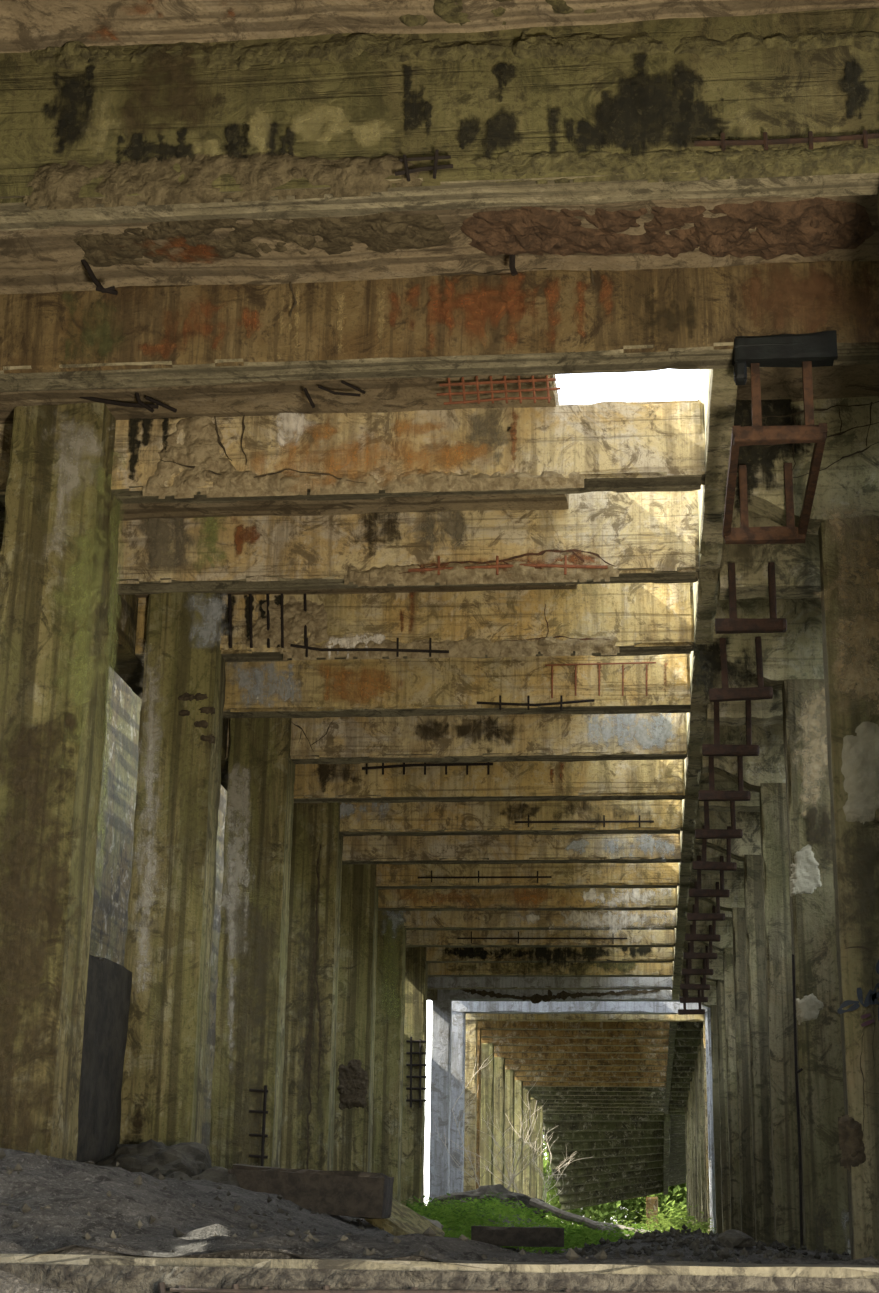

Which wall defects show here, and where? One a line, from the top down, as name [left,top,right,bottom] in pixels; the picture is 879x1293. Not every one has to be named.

leakage [43,59,95,153]
leakage [548,54,730,157]
leakage [838,60,870,119]
spalling [73,197,875,295]
leakage [128,417,177,480]
leakage [416,718,514,752]